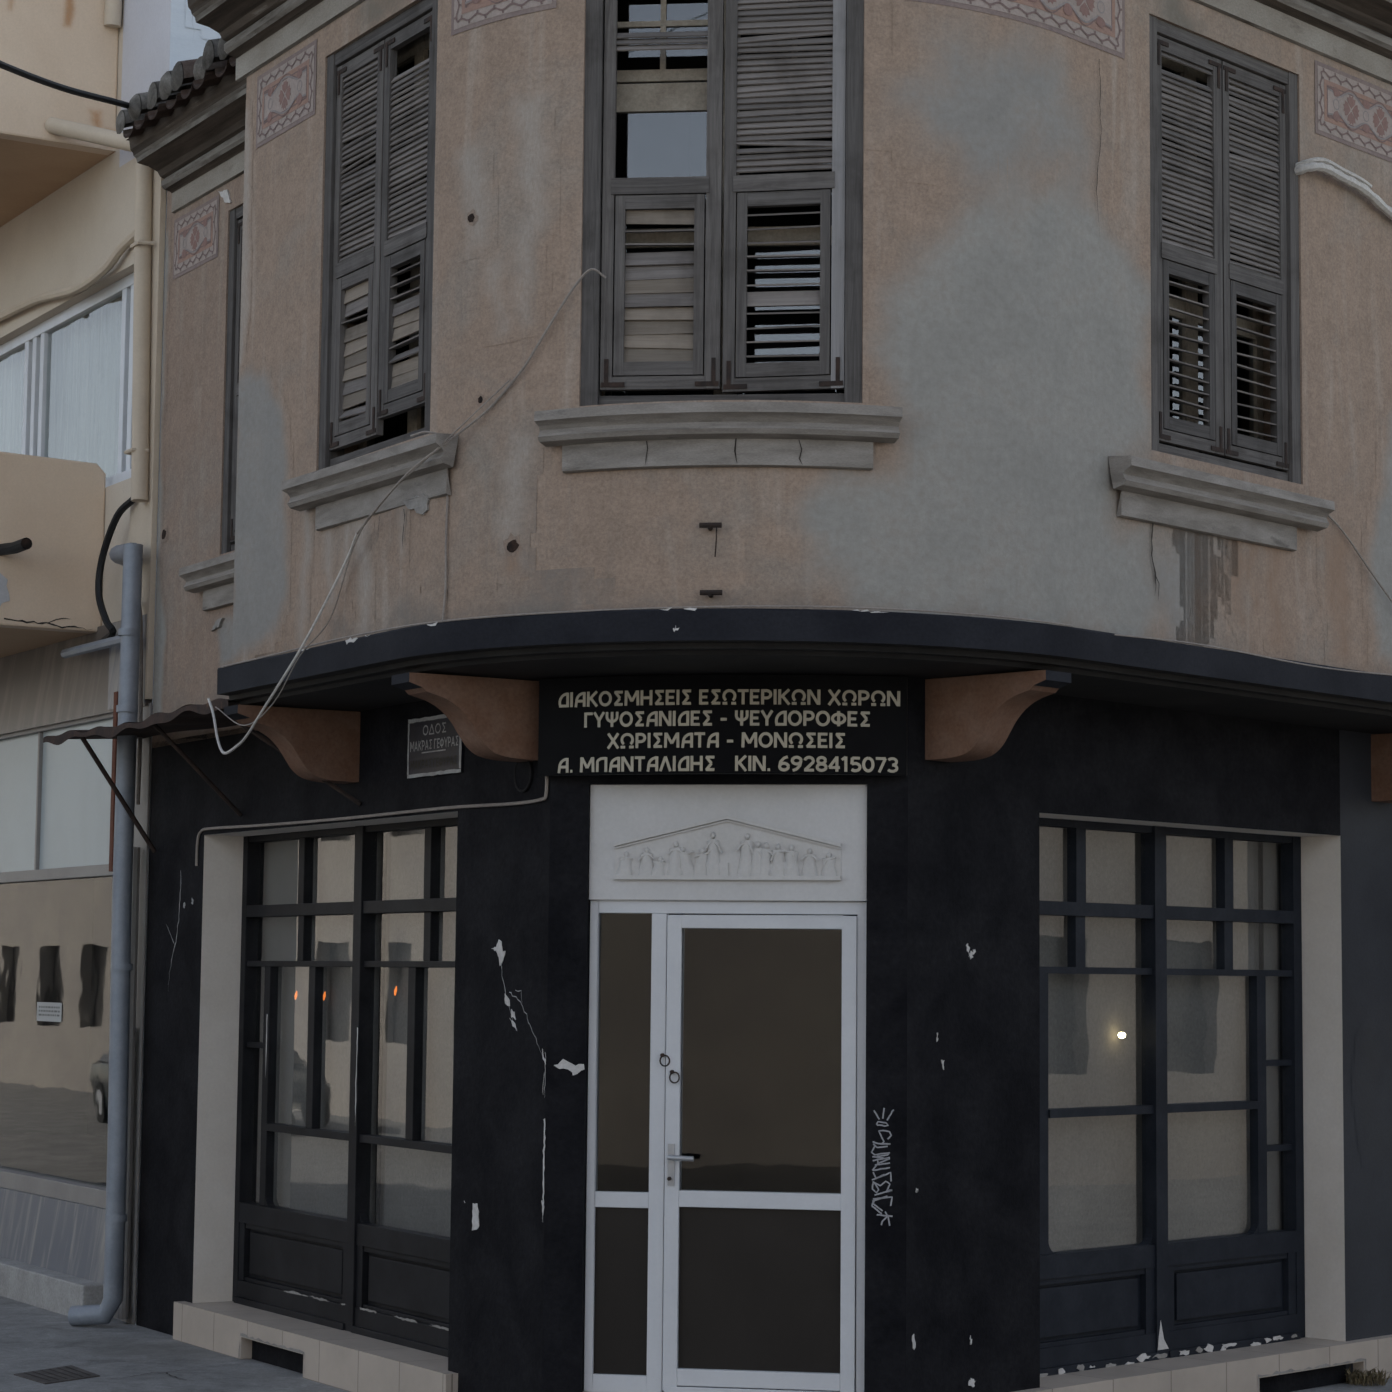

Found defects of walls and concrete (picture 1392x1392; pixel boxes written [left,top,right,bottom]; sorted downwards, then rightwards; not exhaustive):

corrosion [59,0,80,32]
leakage [1172,528,1293,660]
leakage [1317,513,1361,670]